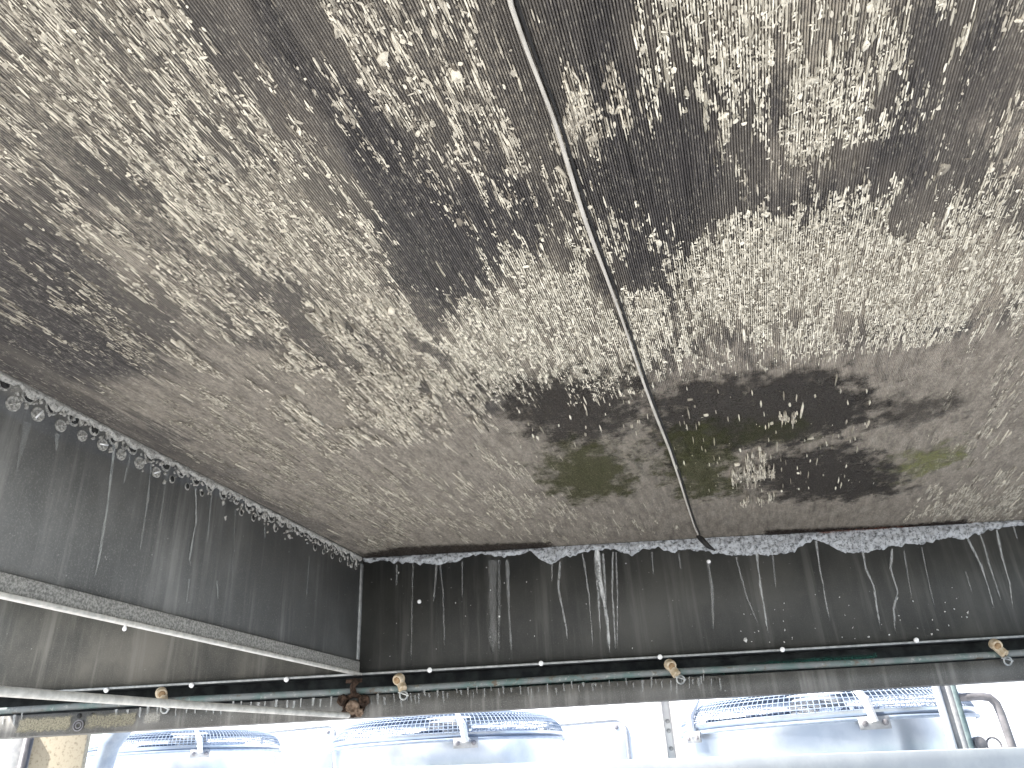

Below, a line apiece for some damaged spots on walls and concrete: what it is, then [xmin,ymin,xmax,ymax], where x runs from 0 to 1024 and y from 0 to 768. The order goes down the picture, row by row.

peeling [0,0,1024,568]
water stain [0,360,1024,649]